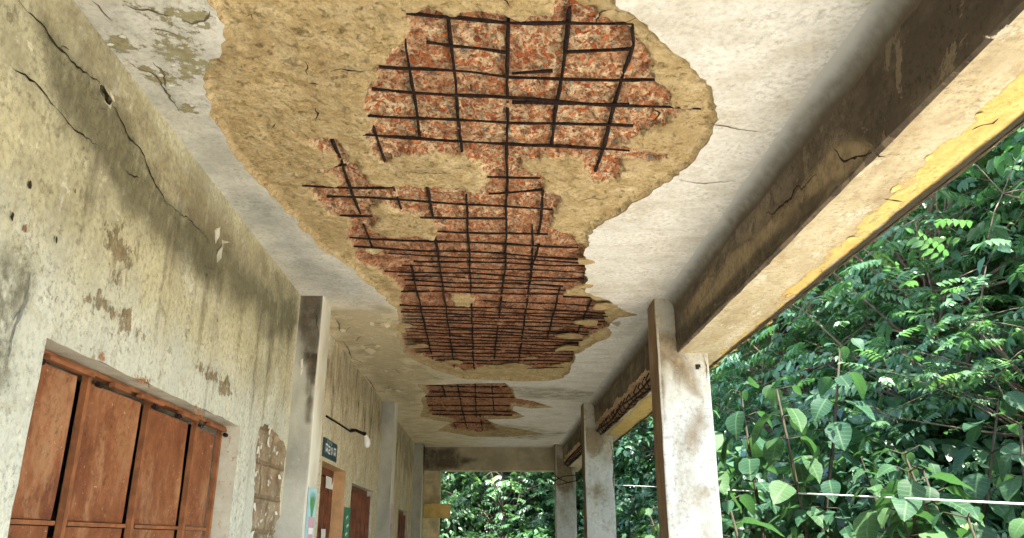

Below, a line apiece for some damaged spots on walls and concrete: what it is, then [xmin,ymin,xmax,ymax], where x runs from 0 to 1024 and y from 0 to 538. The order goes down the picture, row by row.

peeling [987,24,1015,40]
spalling [100,85,115,105]
crack [9,0,211,247]
damp [44,25,322,379]
spalling [104,0,718,437]
crack [767,174,817,214]
crack [833,148,884,163]
peeling [695,72,1024,369]
spalling [251,424,286,538]
spalling [563,442,582,467]